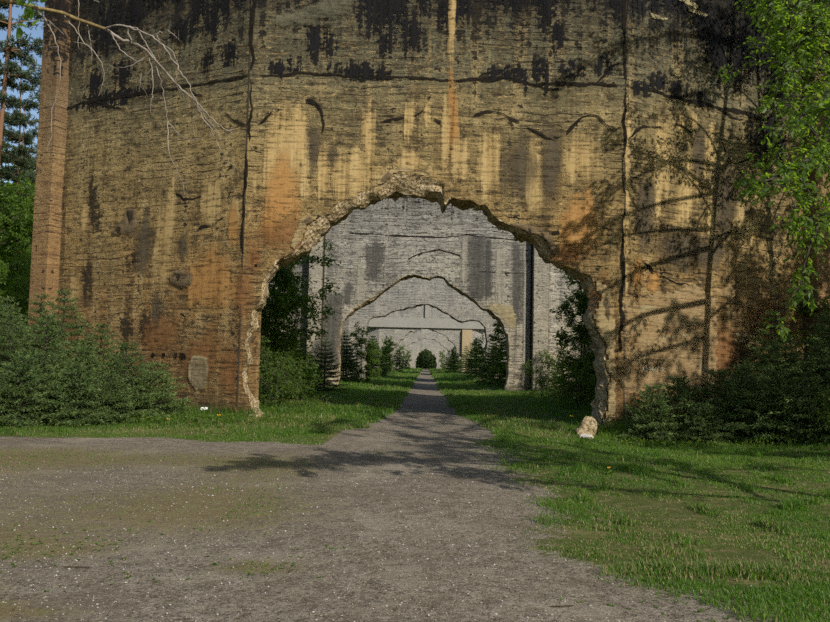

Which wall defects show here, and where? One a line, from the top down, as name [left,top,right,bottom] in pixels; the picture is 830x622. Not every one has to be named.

leakage [68,0,179,113]
leakage [170,0,242,76]
leakage [264,0,472,82]
leakage [478,0,616,98]
peeling [679,0,707,17]
leakage [253,101,380,211]
leakage [397,102,426,174]
crack [67,0,784,352]
corrosion [448,72,459,150]
leakage [441,96,468,180]
leakage [477,126,599,211]
leakage [610,0,804,309]